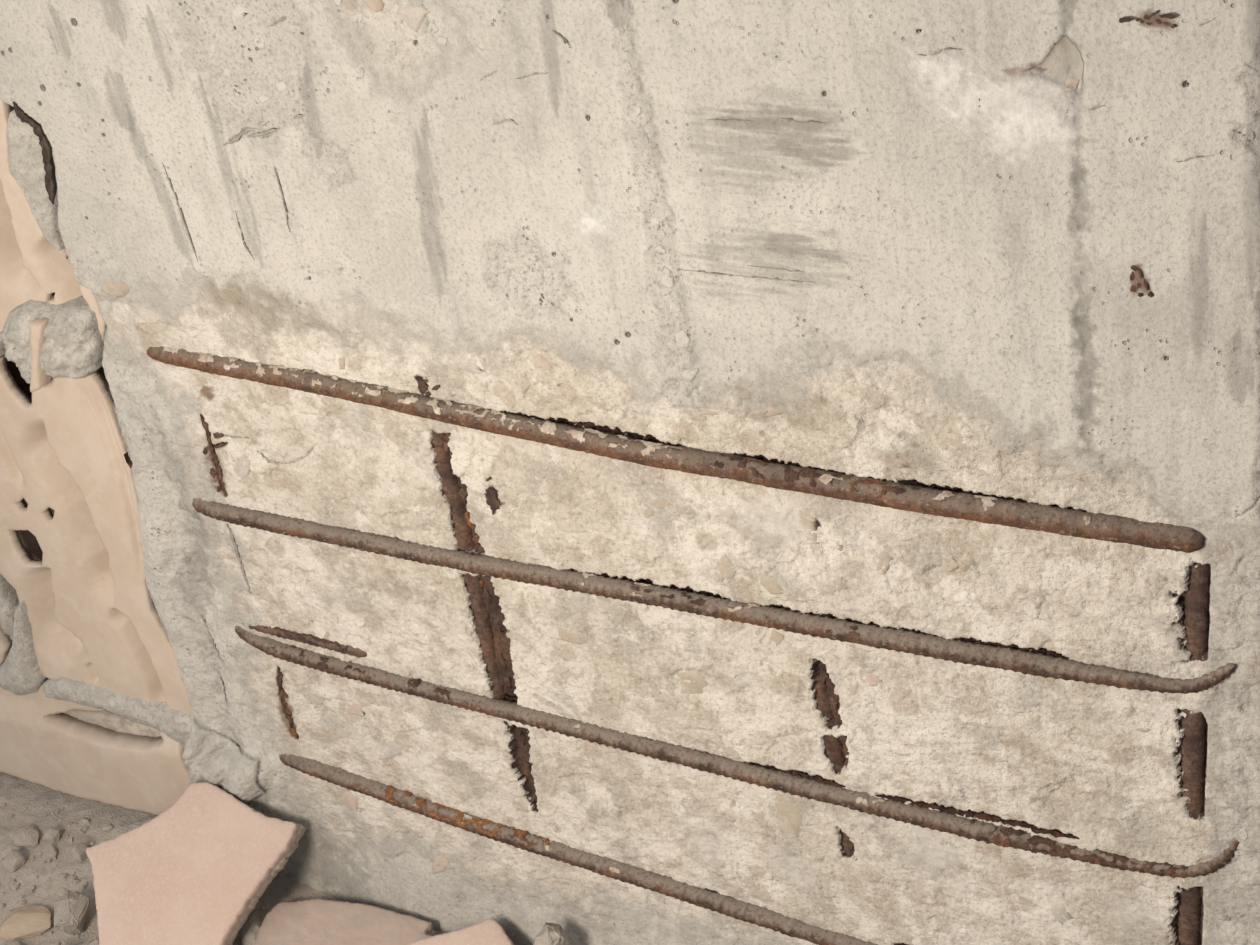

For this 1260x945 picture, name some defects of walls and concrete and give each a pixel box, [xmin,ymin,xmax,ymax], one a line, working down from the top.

spalling [179,0,319,141]
peeling [330,0,465,100]
water stain [906,47,1077,166]
spalling [1001,35,1084,95]
rust [1119,10,1177,29]
spalling [1233,41,1260,180]
rust [1130,265,1154,298]
rust [484,476,503,515]
rust [461,574,517,696]
spalling [96,269,1260,945]
rust [504,721,538,812]
rust [810,659,849,774]